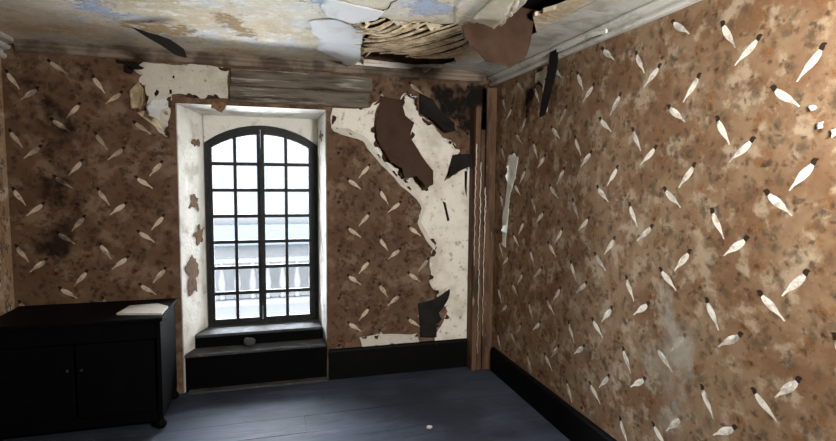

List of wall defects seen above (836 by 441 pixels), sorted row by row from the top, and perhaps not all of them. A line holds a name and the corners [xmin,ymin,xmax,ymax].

damp [121,20,197,36]
peeling [308,0,431,73]
peeling [393,0,455,31]
flaking render [556,29,608,52]
peeling [205,94,226,112]
peeling [399,93,431,125]